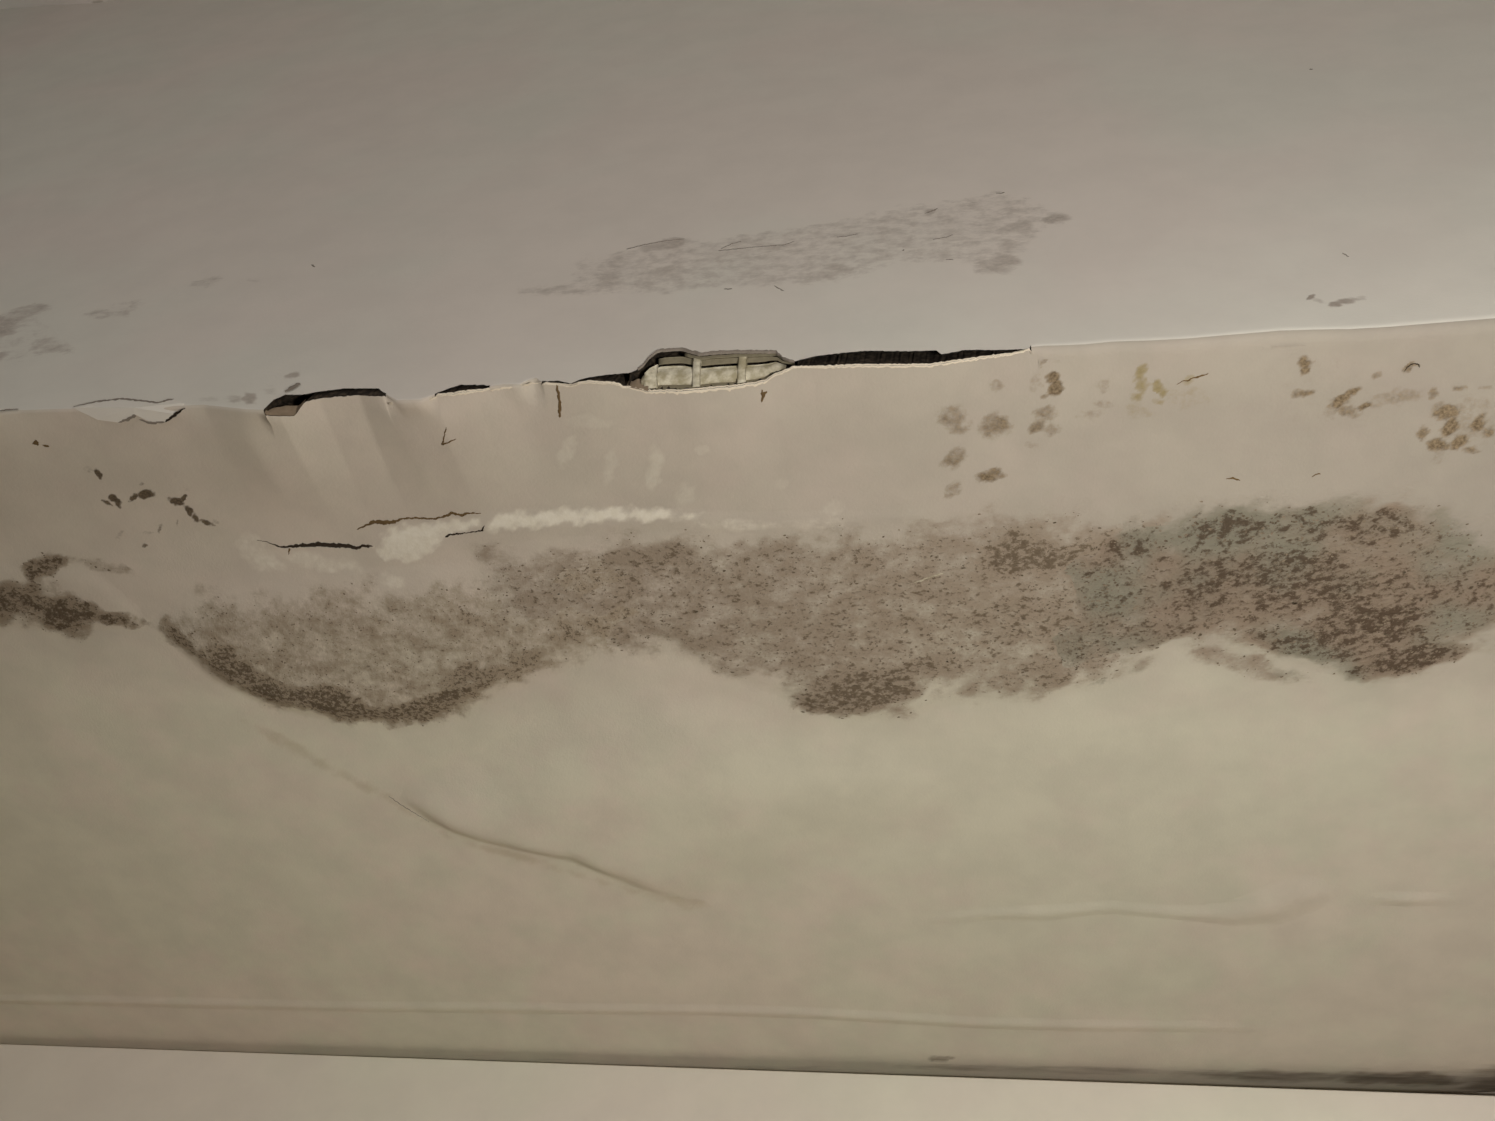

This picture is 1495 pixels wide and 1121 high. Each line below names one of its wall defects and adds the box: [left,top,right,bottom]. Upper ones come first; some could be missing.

flaking render [627,347,799,395]
water stain [81,463,225,549]
crack [257,511,484,555]
water stain [0,481,1495,731]